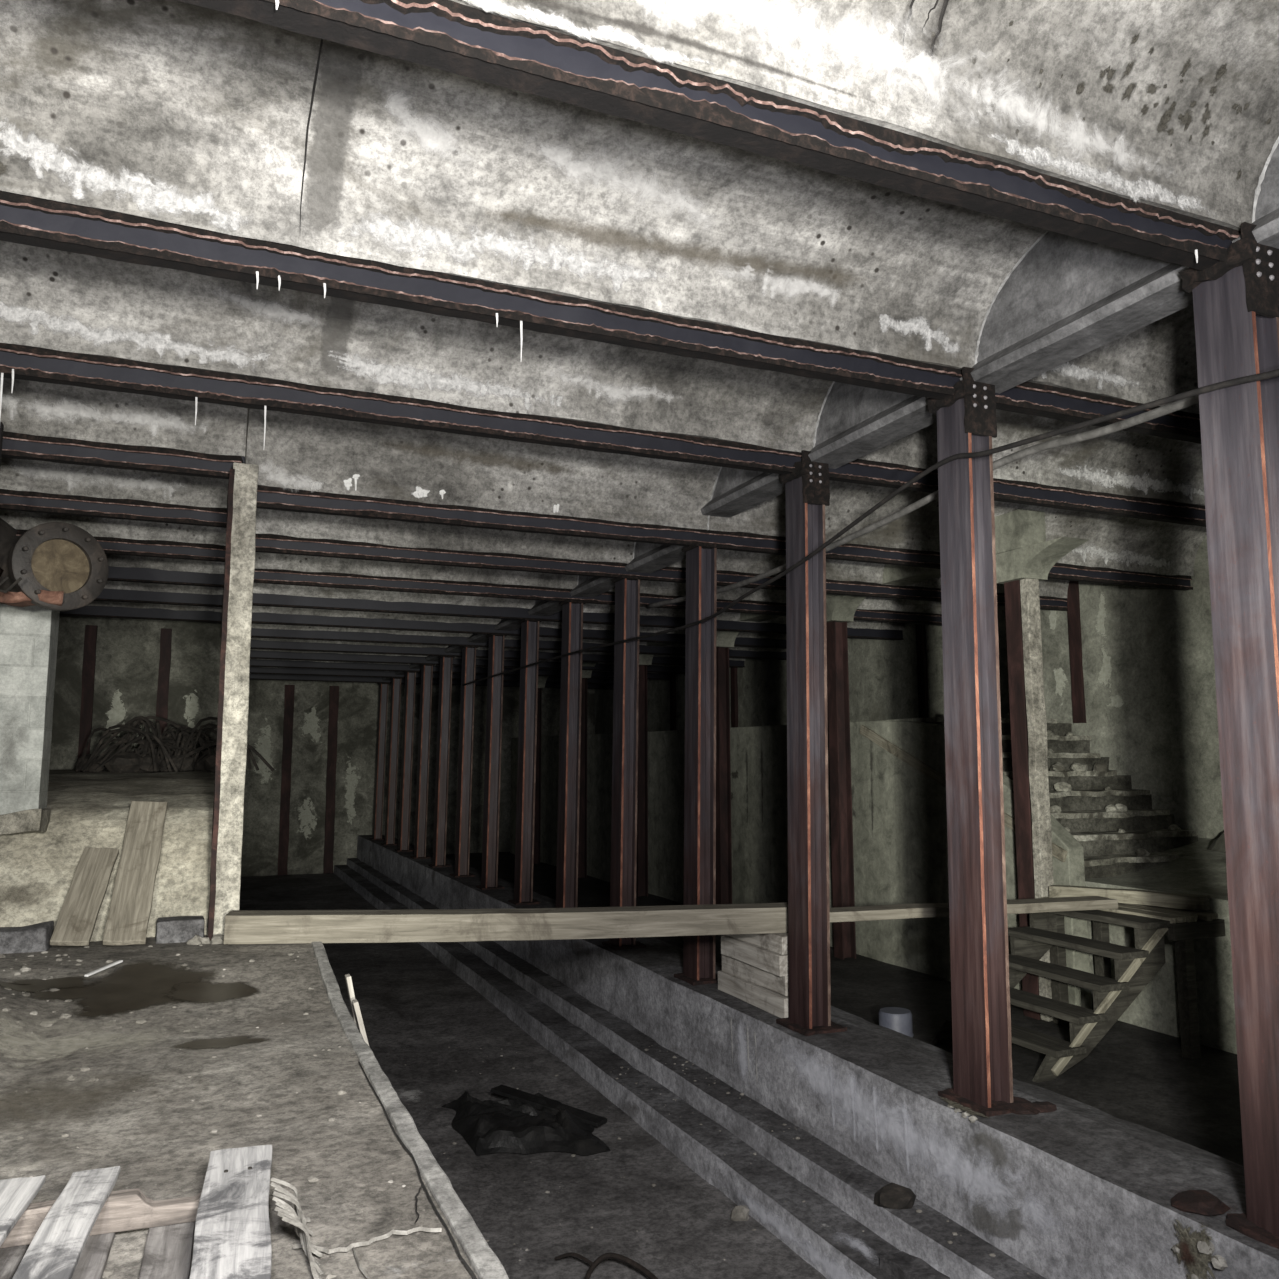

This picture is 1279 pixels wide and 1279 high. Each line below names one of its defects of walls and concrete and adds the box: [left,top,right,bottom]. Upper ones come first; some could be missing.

water stain [466,0,829,88]
water stain [639,0,947,108]
crack [903,0,949,91]
spalling [1100,59,1227,146]
water stain [0,120,247,230]
water stain [879,314,960,353]
water stain [0,960,269,1066]